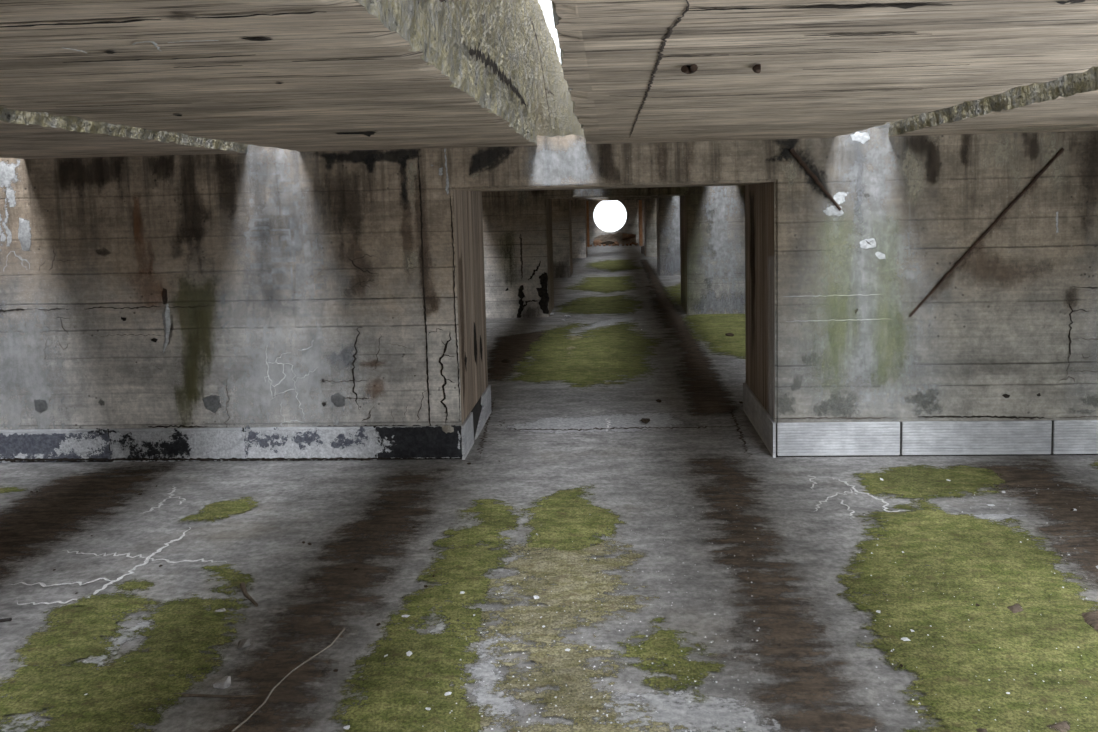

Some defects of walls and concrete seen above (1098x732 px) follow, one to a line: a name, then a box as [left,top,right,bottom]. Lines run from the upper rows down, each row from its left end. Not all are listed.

crack [610,0,1022,138]
leakage [60,158,120,195]
leakage [149,155,208,260]
crack [264,196,460,427]
spalling [505,272,550,314]
leakage [775,139,798,160]
leakage [802,135,940,419]
corrosion [909,148,1065,317]
crack [1061,286,1098,383]
peeling [0,425,463,463]
crack [0,399,752,462]
crack [11,487,226,605]